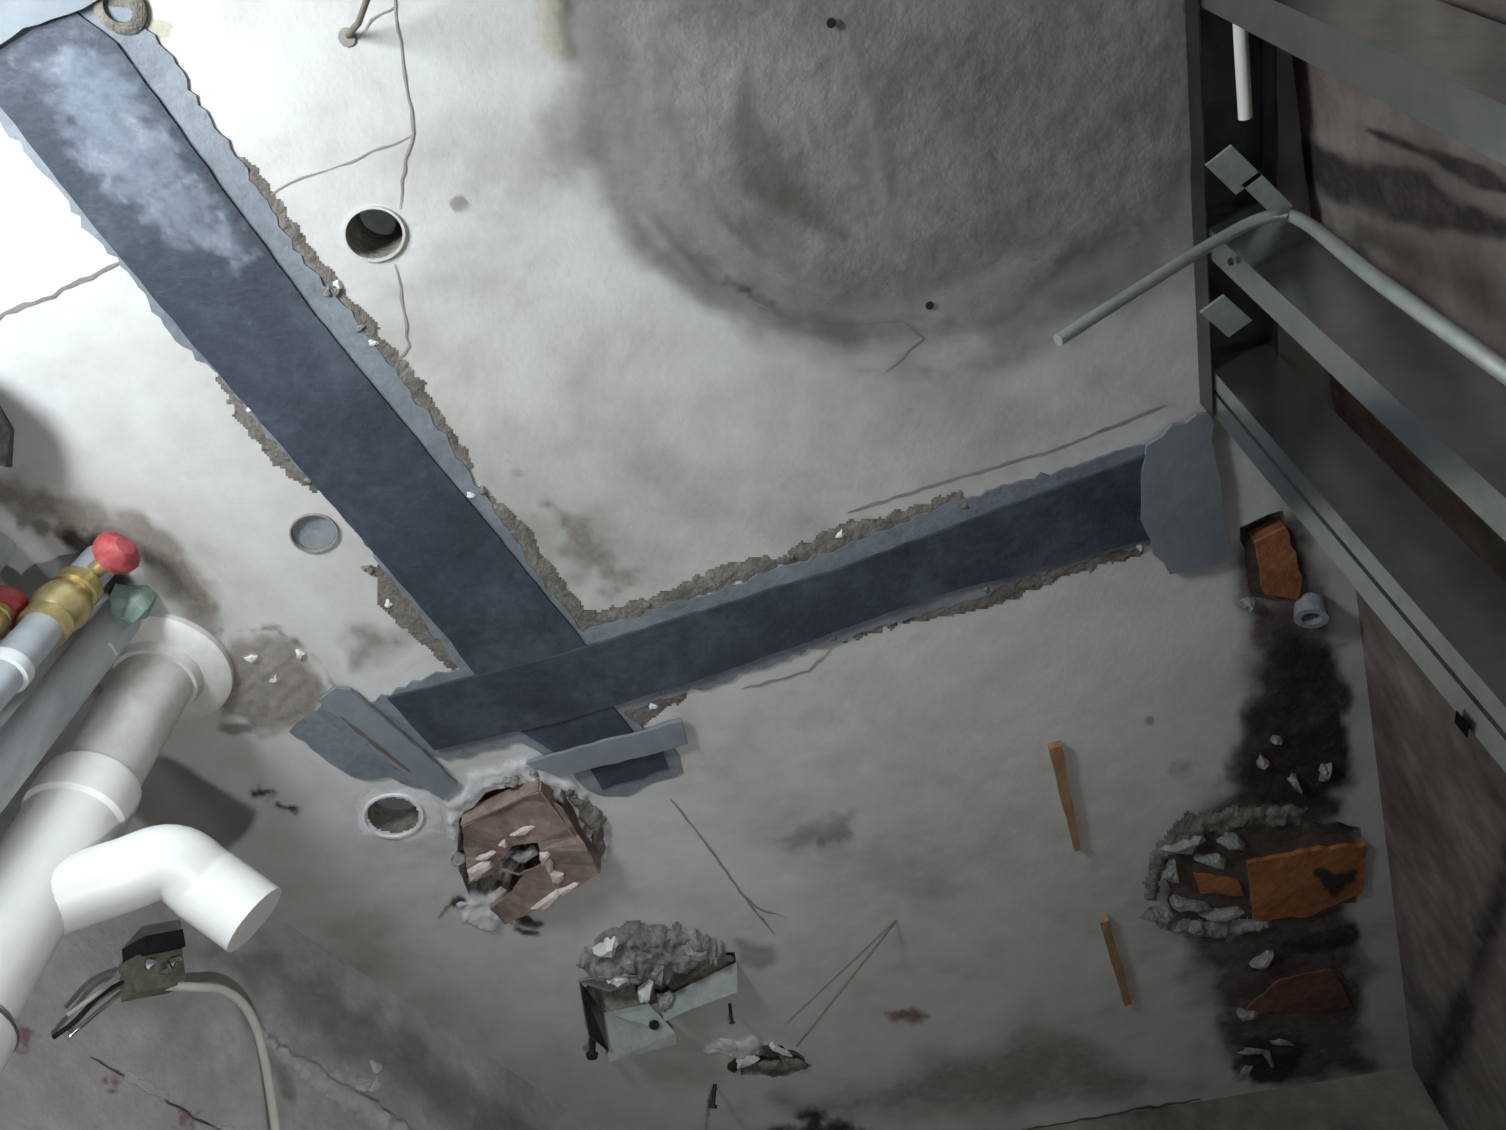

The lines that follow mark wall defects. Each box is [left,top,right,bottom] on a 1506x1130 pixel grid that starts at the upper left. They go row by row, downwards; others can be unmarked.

crack [271,0,414,210]
water stain [1301,130,1506,238]
crack [0,262,120,319]
crack [394,264,410,360]
spalling [1236,510,1302,612]
spalling [1140,635,1367,944]
spalling [441,759,609,932]
spalling [585,952,736,1013]
spalling [1236,925,1359,1022]
peeling [1237,1038,1294,1081]